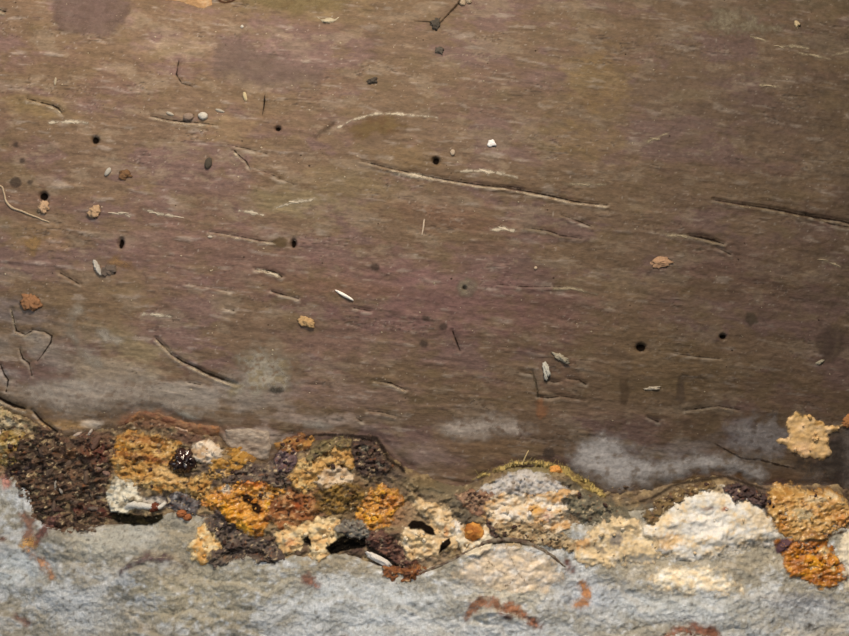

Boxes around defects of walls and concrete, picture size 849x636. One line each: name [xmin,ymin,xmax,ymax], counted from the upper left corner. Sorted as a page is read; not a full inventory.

crack [370,163,605,239]
crack [717,200,849,227]
spalling [2,425,167,534]
peeling [124,410,271,460]
spalling [242,493,263,514]
spalling [345,433,395,479]
damp [573,435,766,502]
spalling [723,482,775,516]
spalling [303,532,367,554]
spalling [403,520,435,543]